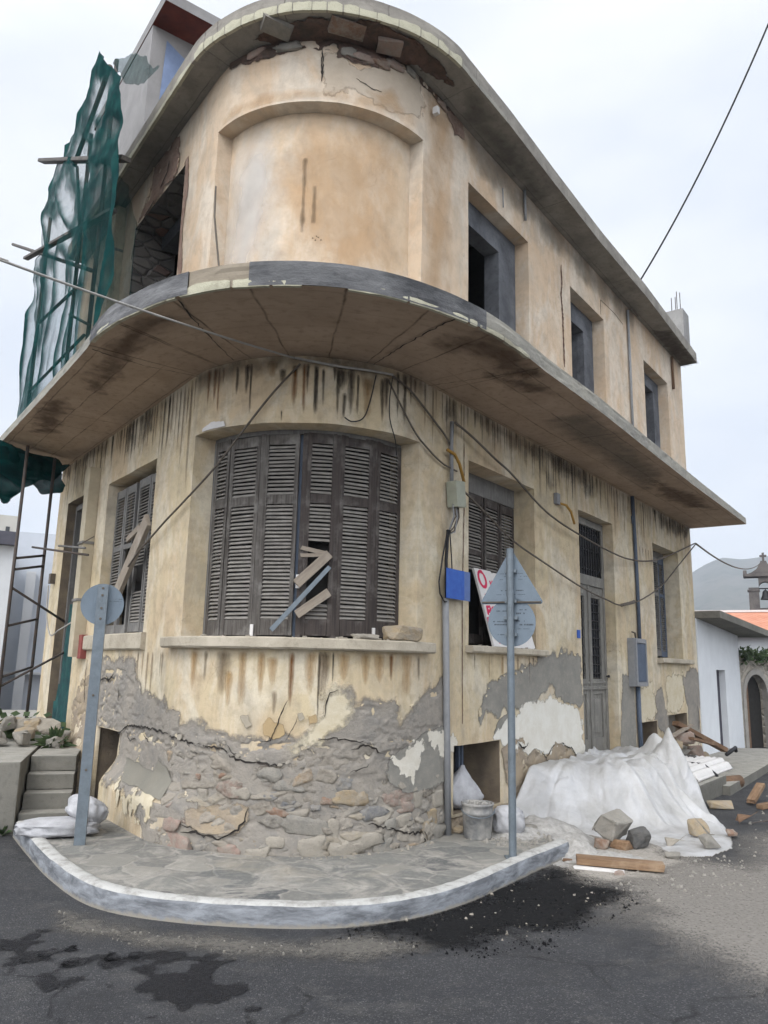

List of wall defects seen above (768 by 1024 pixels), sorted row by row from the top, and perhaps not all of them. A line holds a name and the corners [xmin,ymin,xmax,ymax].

spalling [117,1,507,182]
crack [318,49,326,81]
crack [559,267,567,367]
damp [202,421,225,432]
damp [236,365,252,406]
damp [307,365,426,416]
crack [117,702,299,767]
peeling [70,655,463,857]
damp [309,654,345,706]
crack [318,690,386,773]
peeling [478,647,585,821]
peeling [621,667,701,747]